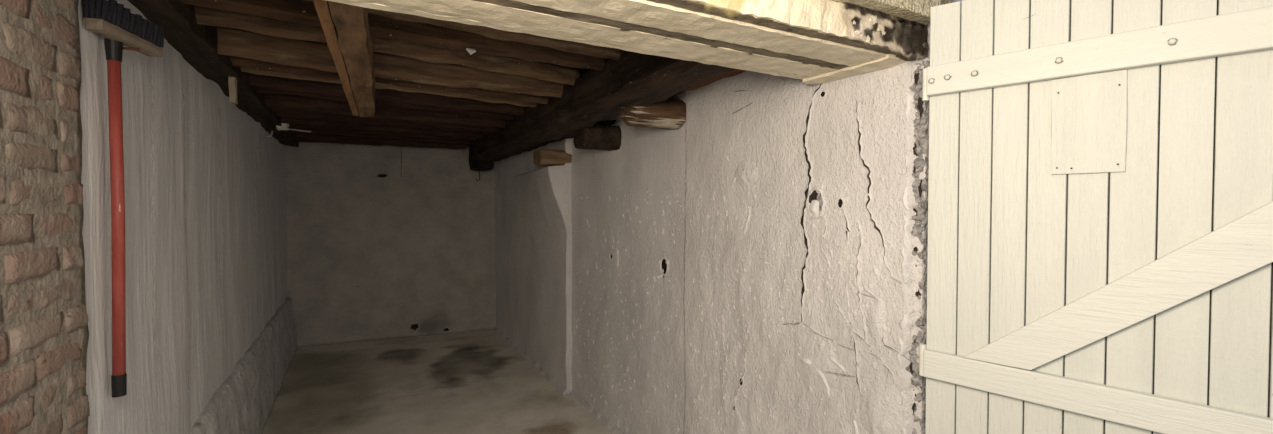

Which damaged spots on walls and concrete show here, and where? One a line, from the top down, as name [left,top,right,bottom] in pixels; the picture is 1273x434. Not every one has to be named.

flaking render [806,186,845,219]
crack [782,84,910,397]
spalling [842,2,930,434]